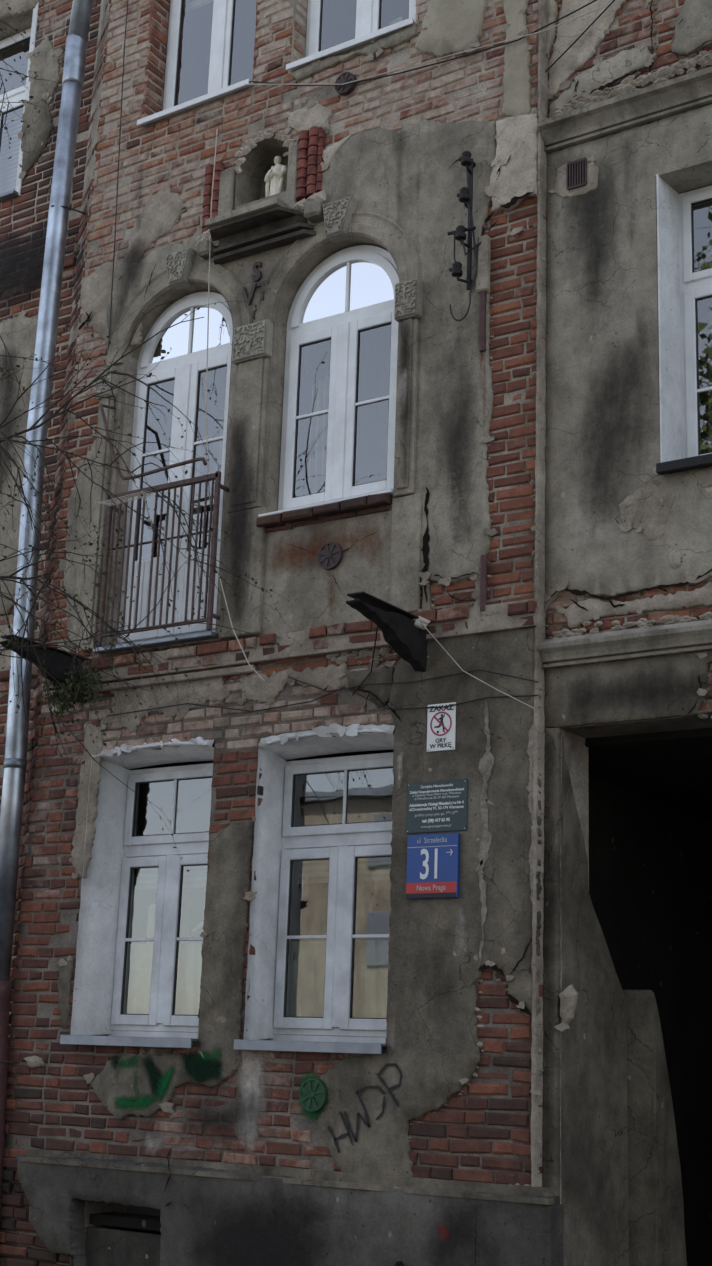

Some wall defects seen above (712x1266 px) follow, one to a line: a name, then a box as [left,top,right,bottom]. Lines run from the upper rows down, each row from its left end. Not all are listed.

peeling [17,37,64,180]
peeling [291,0,487,82]
peeling [500,0,712,118]
spalling [417,222,712,639]
crack [420,487,477,602]
spalling [408,960,579,1186]